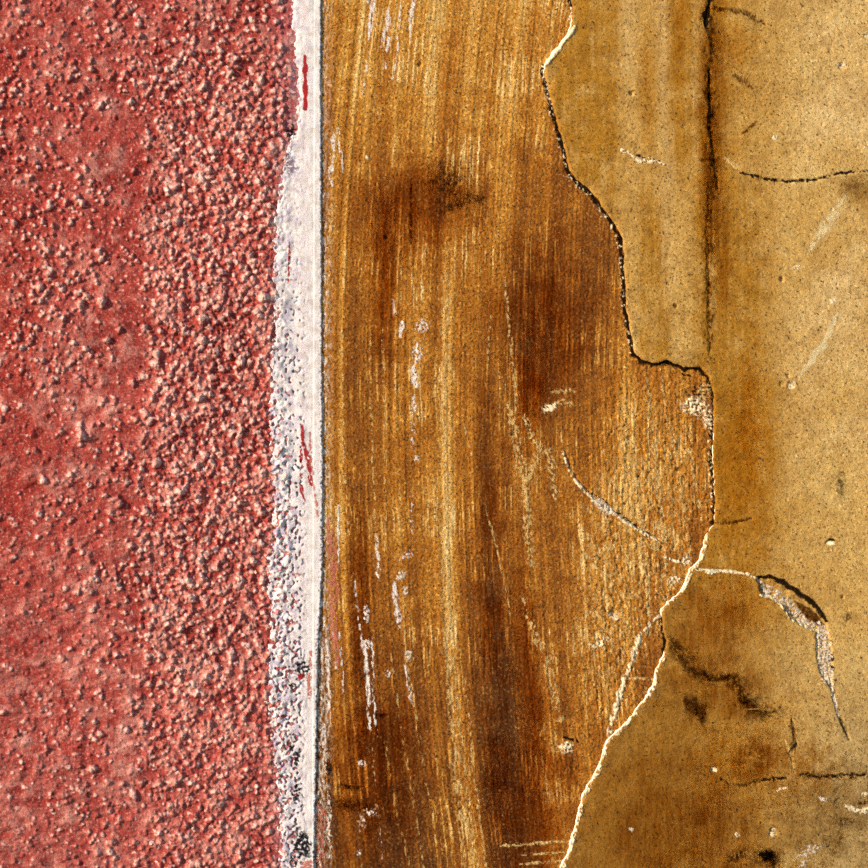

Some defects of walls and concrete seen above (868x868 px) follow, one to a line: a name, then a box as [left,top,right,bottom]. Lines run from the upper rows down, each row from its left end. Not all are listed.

crack [725,157,868,183]
flaking render [543,389,575,412]
flaking render [681,373,712,427]
crack [540,0,765,868]
flaking render [577,377,702,686]
flaking render [756,574,846,730]
flaking render [559,736,579,753]
crack [727,720,866,786]